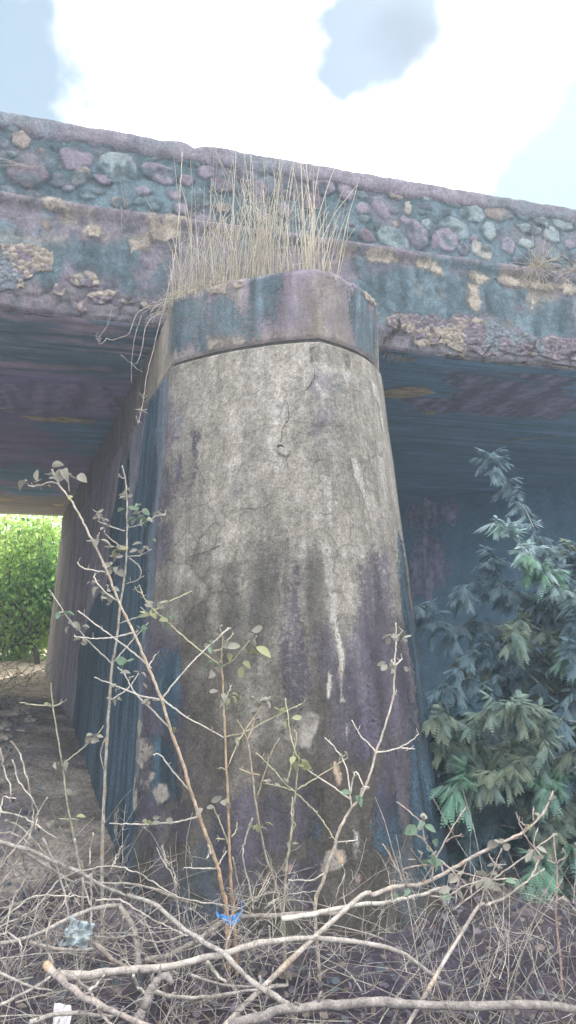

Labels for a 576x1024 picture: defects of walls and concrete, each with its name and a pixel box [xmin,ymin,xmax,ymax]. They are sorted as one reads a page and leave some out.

spalling [0,242,162,314]
damp [165,254,528,362]
flaking render [365,247,443,275]
spalling [363,270,576,370]
damp [534,300,576,339]
crack [281,365,349,468]